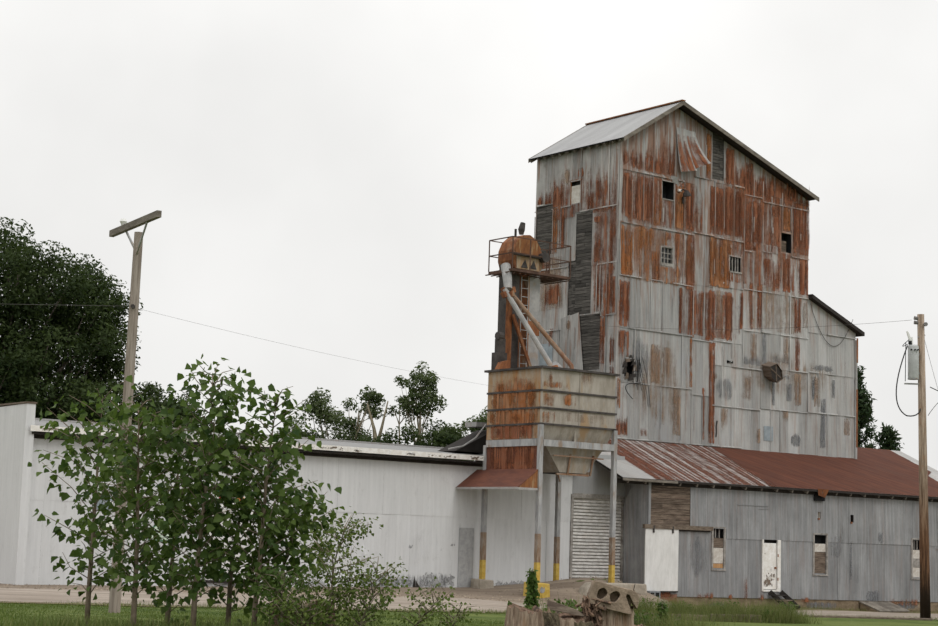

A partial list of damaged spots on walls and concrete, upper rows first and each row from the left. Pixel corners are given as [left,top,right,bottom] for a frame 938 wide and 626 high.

rust [490,378,576,469]
rust [538,134,938,497]